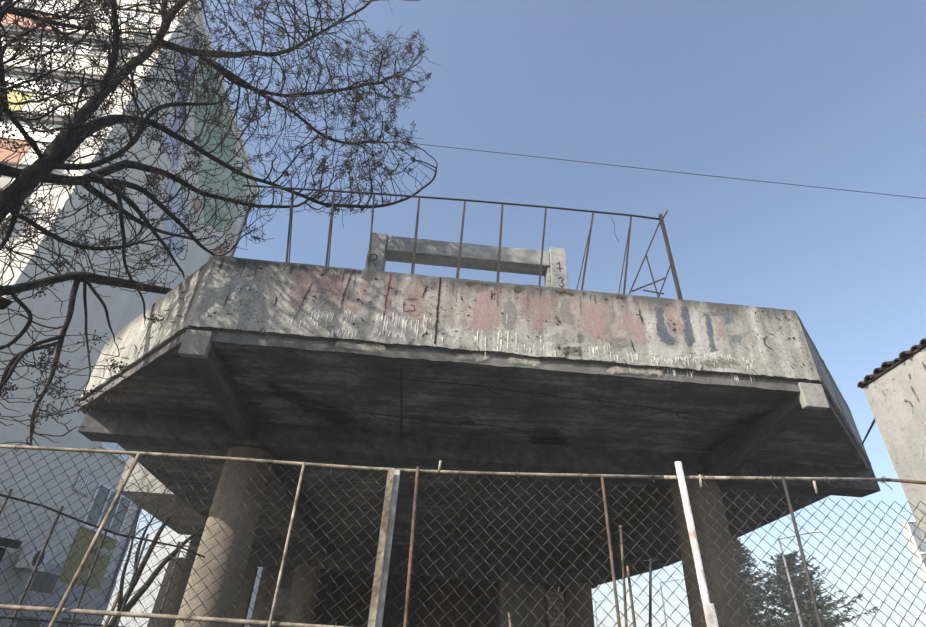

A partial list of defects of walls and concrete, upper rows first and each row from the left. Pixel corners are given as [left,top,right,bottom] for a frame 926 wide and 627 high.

crack [81,273,870,462]